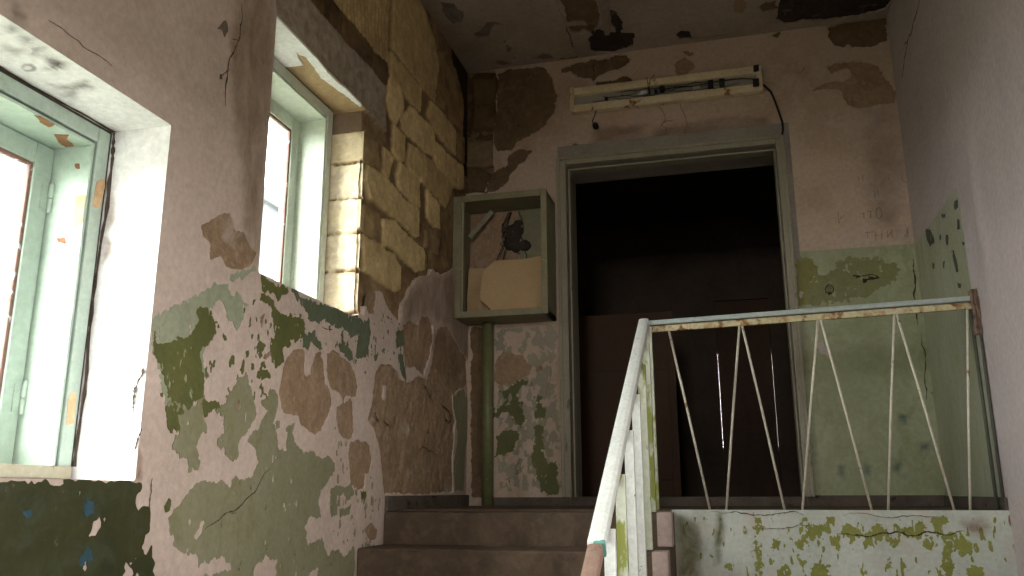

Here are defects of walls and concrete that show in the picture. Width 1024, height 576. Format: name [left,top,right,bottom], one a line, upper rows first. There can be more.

crack [48,20,112,66]
crack [223,12,243,105]
flaking render [812,62,896,109]
peeling [925,200,965,288]
flaking render [151,0,635,576]
peeling [795,256,901,306]
peeling [0,479,155,576]
crack [206,469,270,528]
peeling [686,512,1011,576]
crack [837,513,962,538]